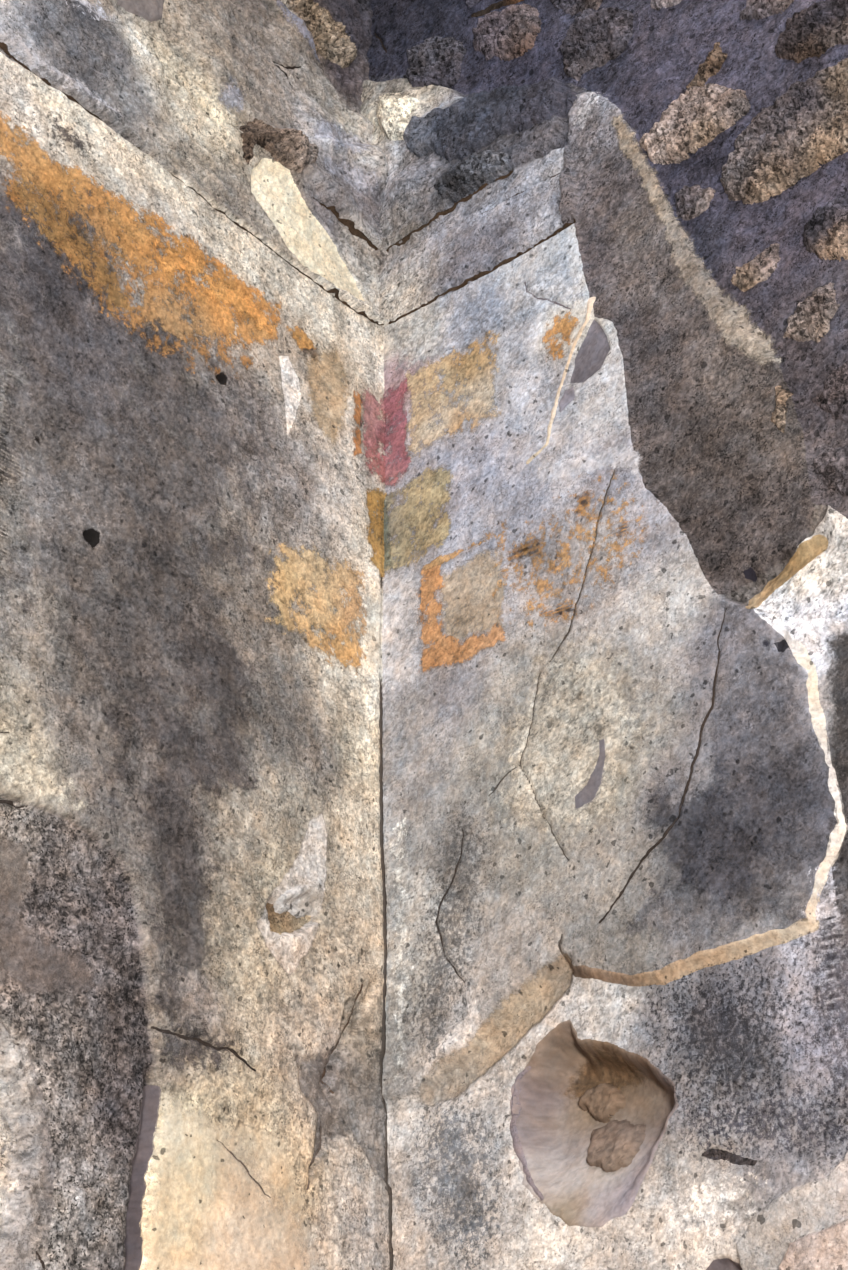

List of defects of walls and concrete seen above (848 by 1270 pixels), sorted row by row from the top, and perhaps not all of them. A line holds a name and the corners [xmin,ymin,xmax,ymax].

spalling [239,118,365,301]
leakage [0,190,271,1075]
spalling [257,813,328,975]
crack [488,468,616,861]
spalling [280,0,848,1228]
crack [598,607,728,924]
leakage [627,602,848,1239]